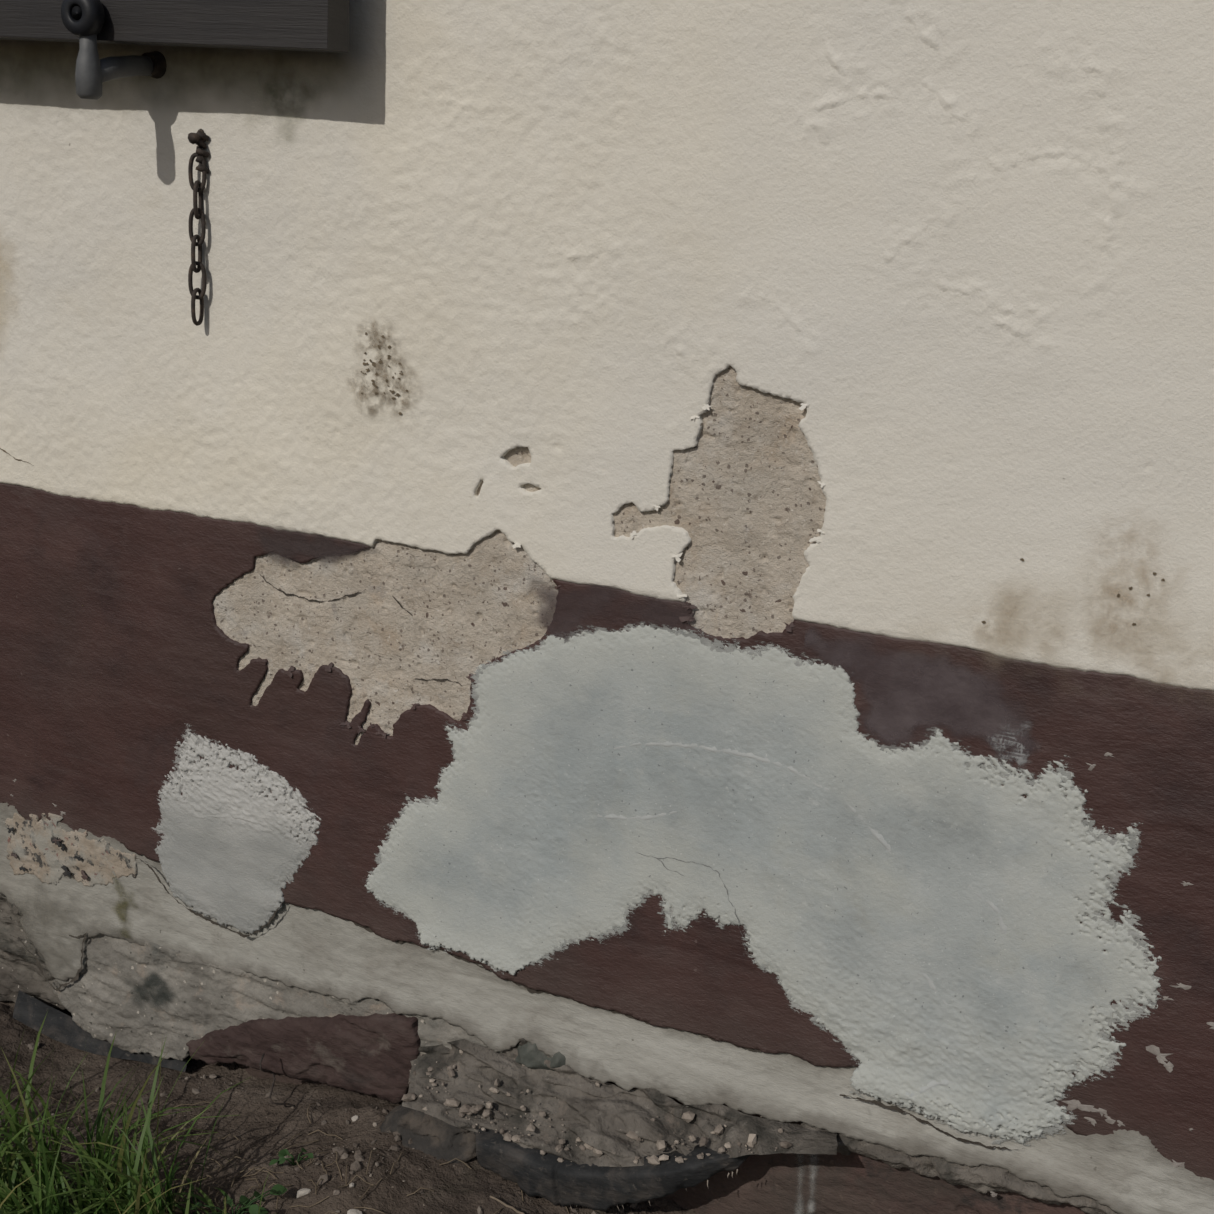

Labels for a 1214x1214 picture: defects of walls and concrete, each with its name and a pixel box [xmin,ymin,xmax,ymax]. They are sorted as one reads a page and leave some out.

leakage [359,325,408,415]
spalling [504,447,531,467]
spalling [613,366,826,639]
spalling [213,530,561,745]
peeling [5,813,137,887]
spalling [0,892,1117,1214]